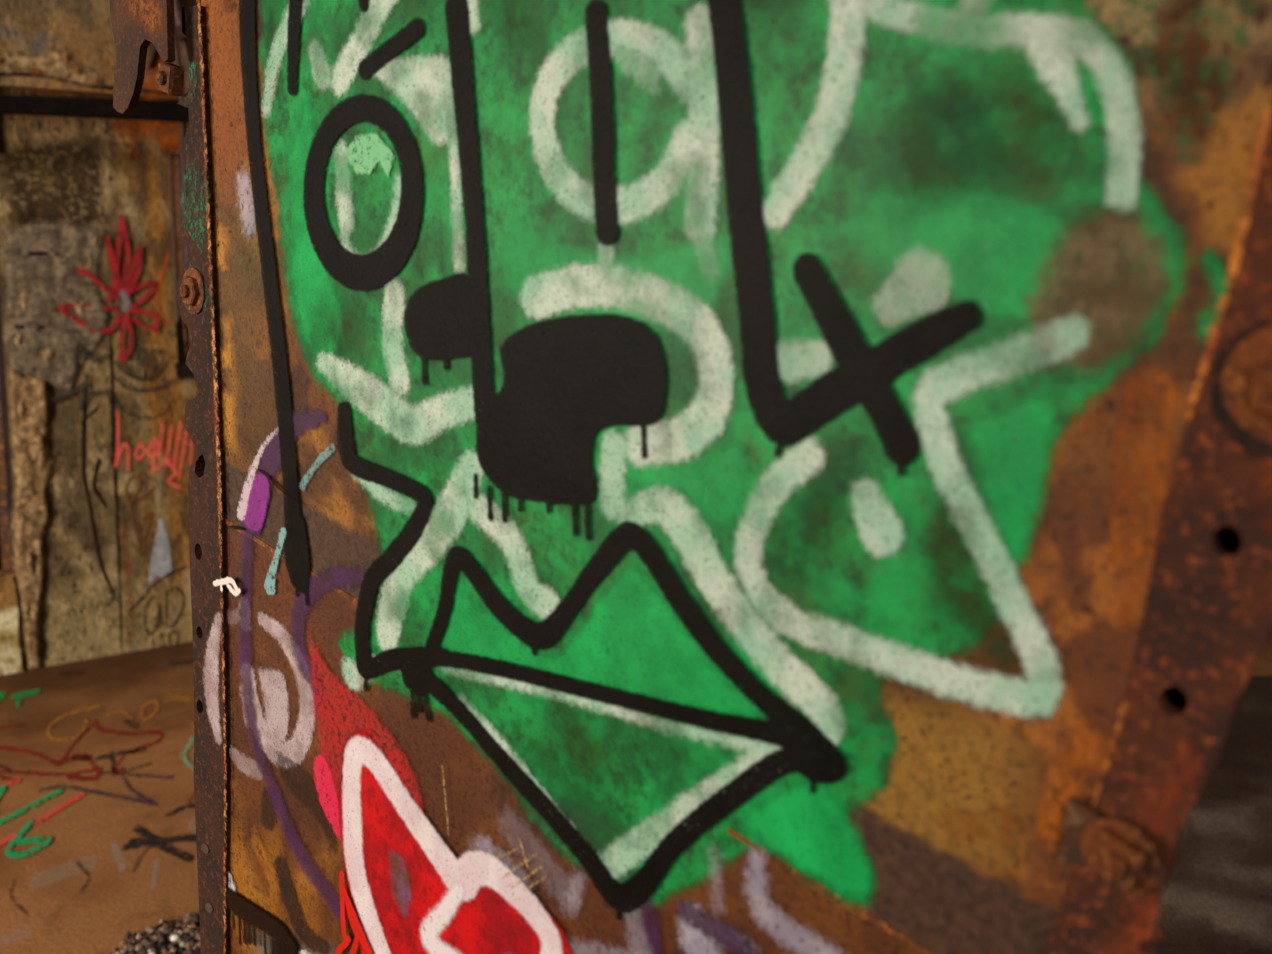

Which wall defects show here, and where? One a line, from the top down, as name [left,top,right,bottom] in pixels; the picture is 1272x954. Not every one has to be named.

rust [128,0,161,30]
rust [141,48,171,100]
rust [115,119,180,204]